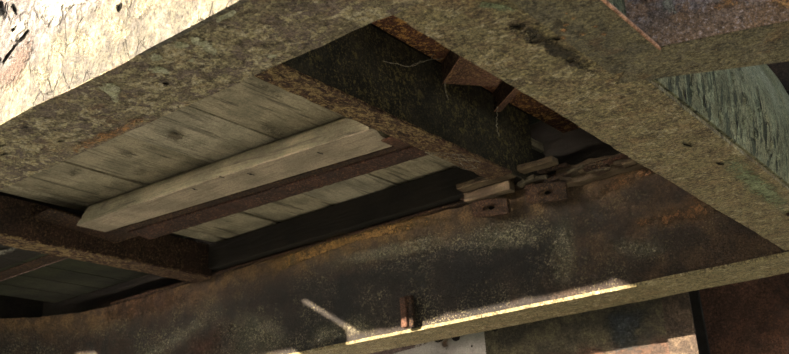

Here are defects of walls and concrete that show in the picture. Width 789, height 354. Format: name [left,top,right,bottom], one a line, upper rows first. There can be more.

rust [256,216,437,274]
rust [484,298,670,354]